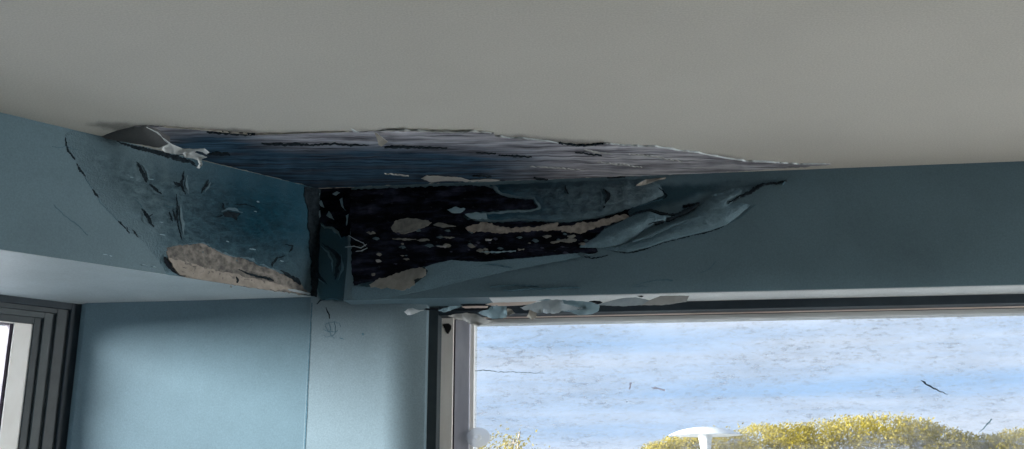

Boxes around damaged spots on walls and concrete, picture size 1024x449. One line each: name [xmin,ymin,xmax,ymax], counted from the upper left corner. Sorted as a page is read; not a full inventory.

crack [52,137,138,237]
crack [117,141,197,239]
peeling [136,125,830,300]
peeling [405,295,690,326]